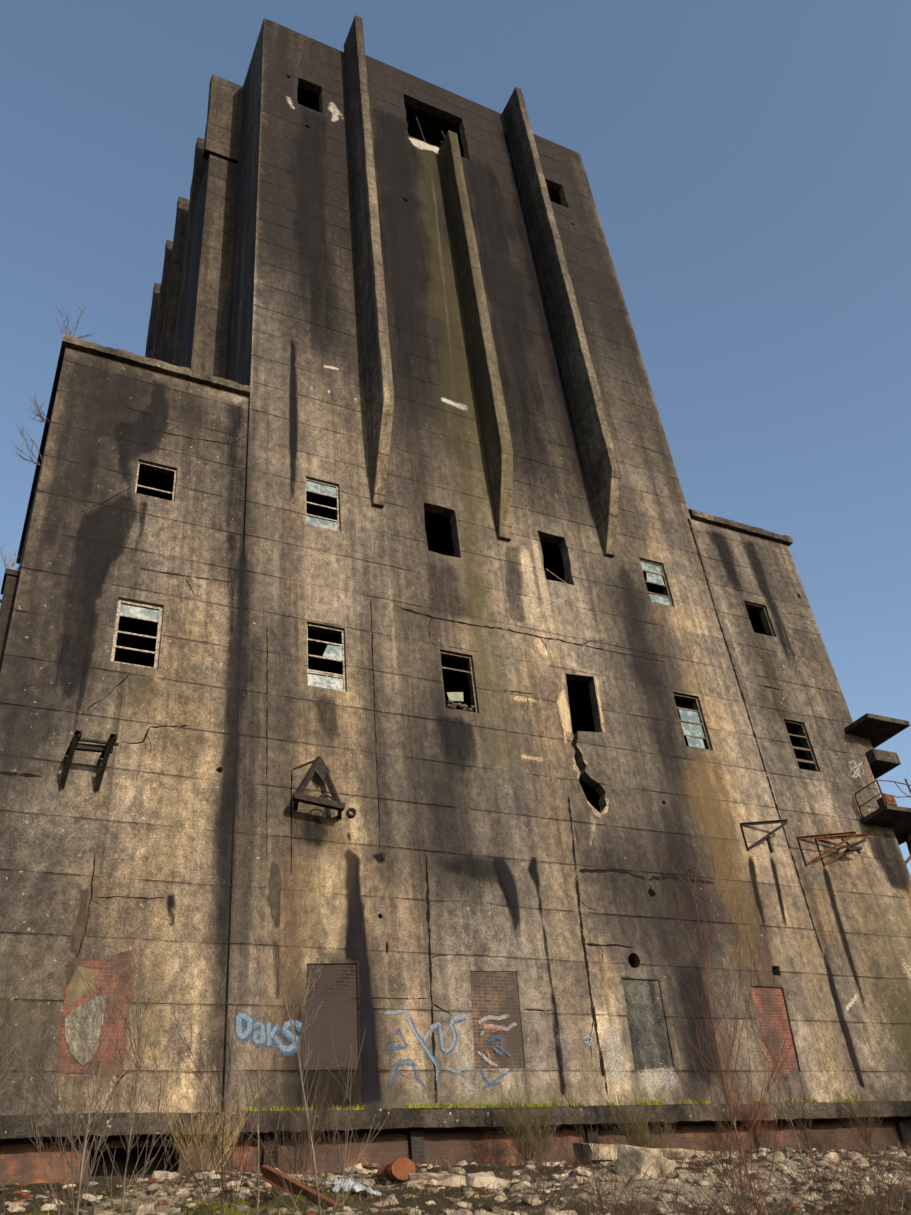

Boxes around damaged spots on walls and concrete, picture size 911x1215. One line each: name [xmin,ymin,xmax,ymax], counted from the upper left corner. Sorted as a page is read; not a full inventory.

leakage [294,111,328,326]
leakage [56,382,168,710]
leakage [711,531,740,587]
leakage [745,542,789,657]
crack [87,676,128,709]
crack [124,725,189,755]
crack [370,602,665,852]
peeling [586,798,609,818]
crack [568,797,715,1095]
leakage [824,955,865,1088]